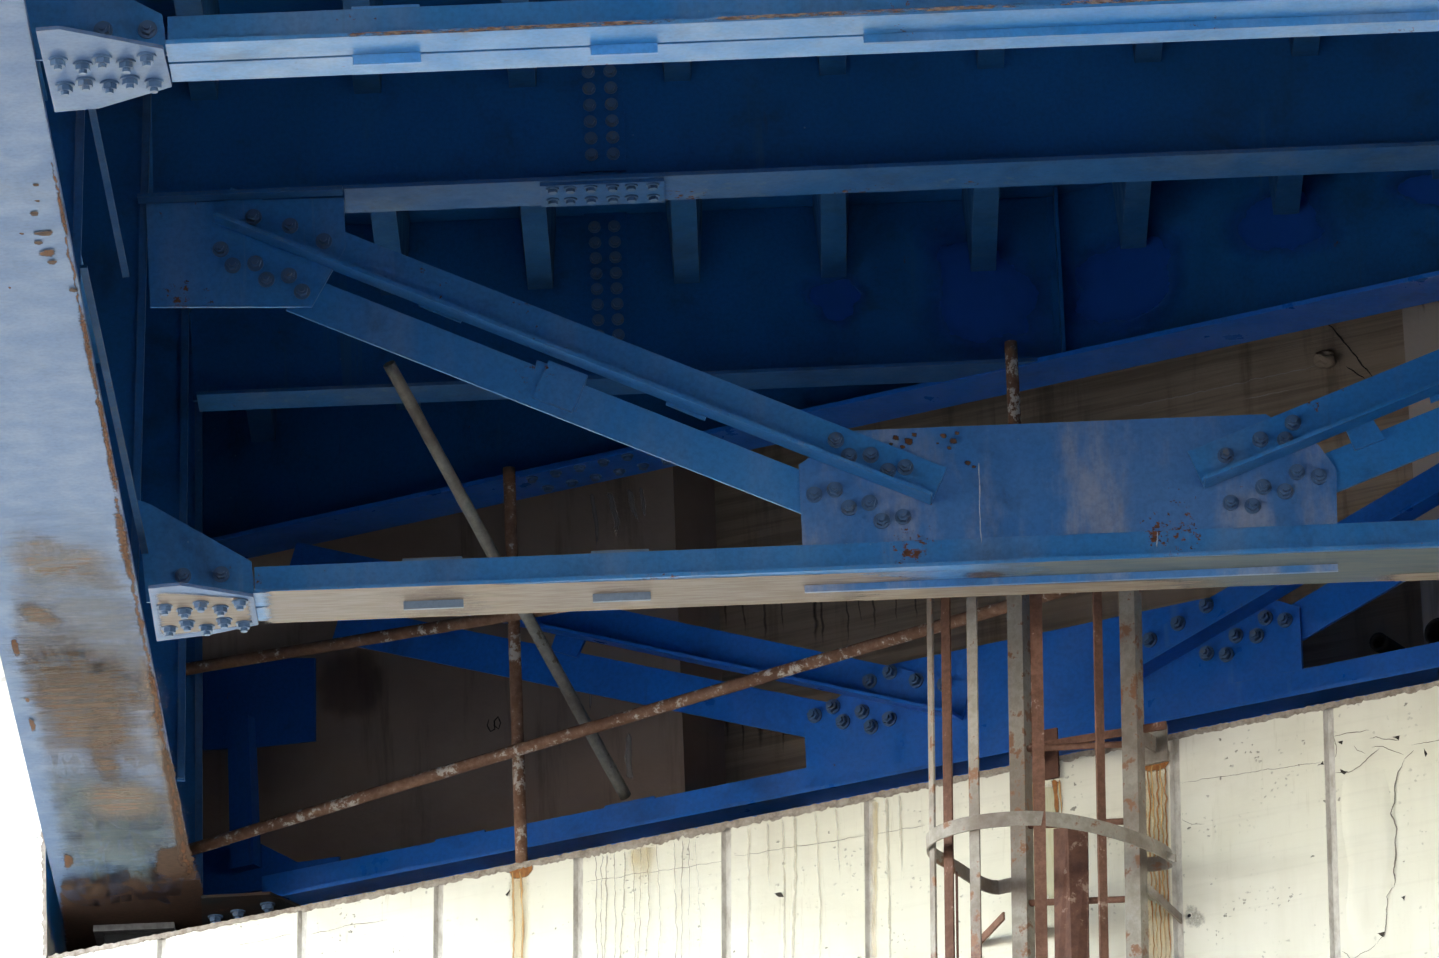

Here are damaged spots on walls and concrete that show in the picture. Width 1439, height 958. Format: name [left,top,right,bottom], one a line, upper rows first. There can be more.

corrosion [889,433,917,449]
corrosion [19,162,251,874]
corrosion [266,572,1201,623]
corrosion [1389,572,1439,582]
corrosion [1052,780,1062,812]
crack [1188,730,1439,958]
corrosion [509,865,533,958]
water stain [595,840,701,958]